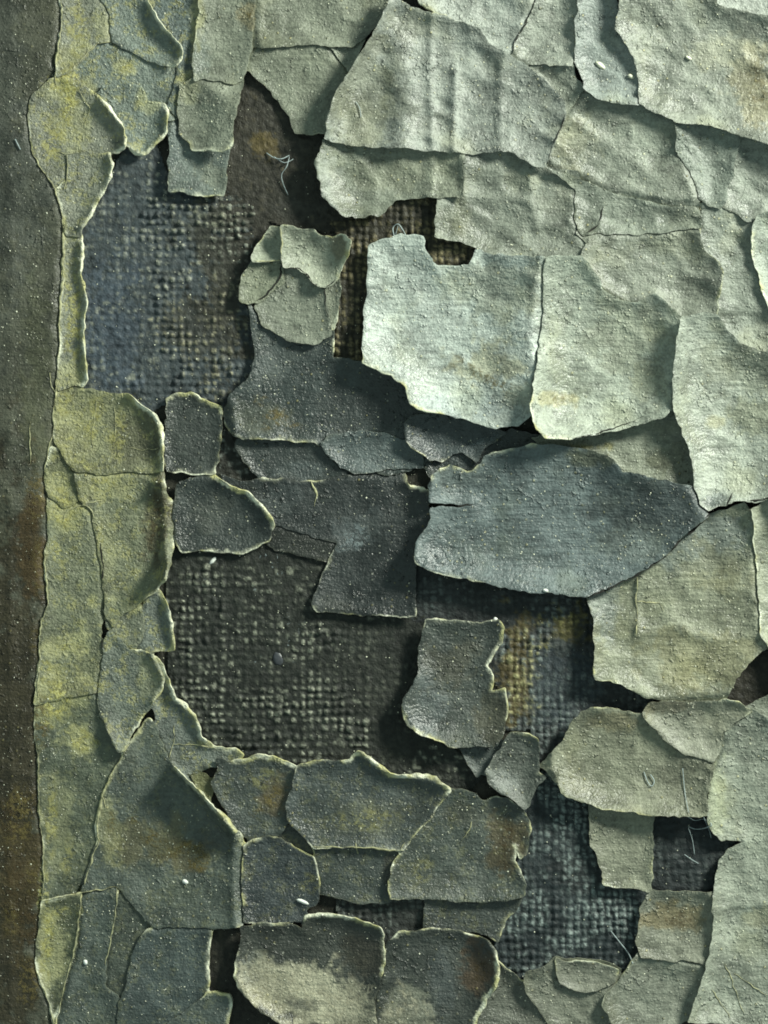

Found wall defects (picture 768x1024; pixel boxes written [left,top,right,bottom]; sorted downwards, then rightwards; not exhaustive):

crack [36,557,49,697]
damp [36,662,70,730]
peeling [0,0,388,1024]
peeling [33,197,768,1024]
crack [35,720,147,1024]